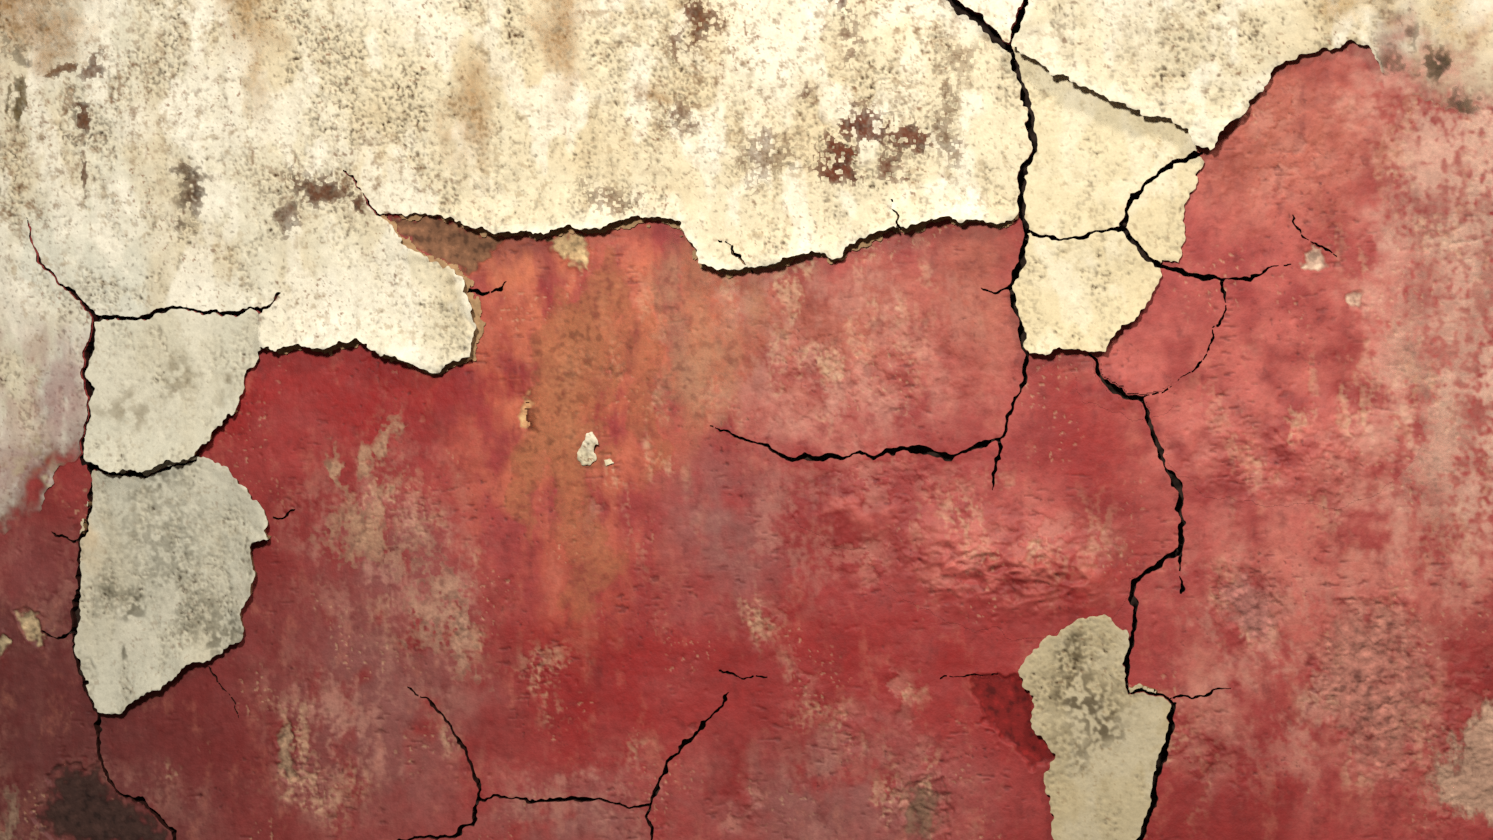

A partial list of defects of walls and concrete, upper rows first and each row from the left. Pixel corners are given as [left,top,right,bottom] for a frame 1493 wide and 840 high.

peeling [959,0,1493,355]
crack [50,269,263,394]
peeling [0,0,1033,714]
crack [712,0,1330,840]
crack [59,460,197,684]
spalling [37,767,167,840]
crack [99,720,146,802]
peeling [278,724,296,779]
crack [399,671,767,840]
peeling [973,614,1171,840]
peeling [1325,606,1421,767]
peeling [1437,702,1493,823]